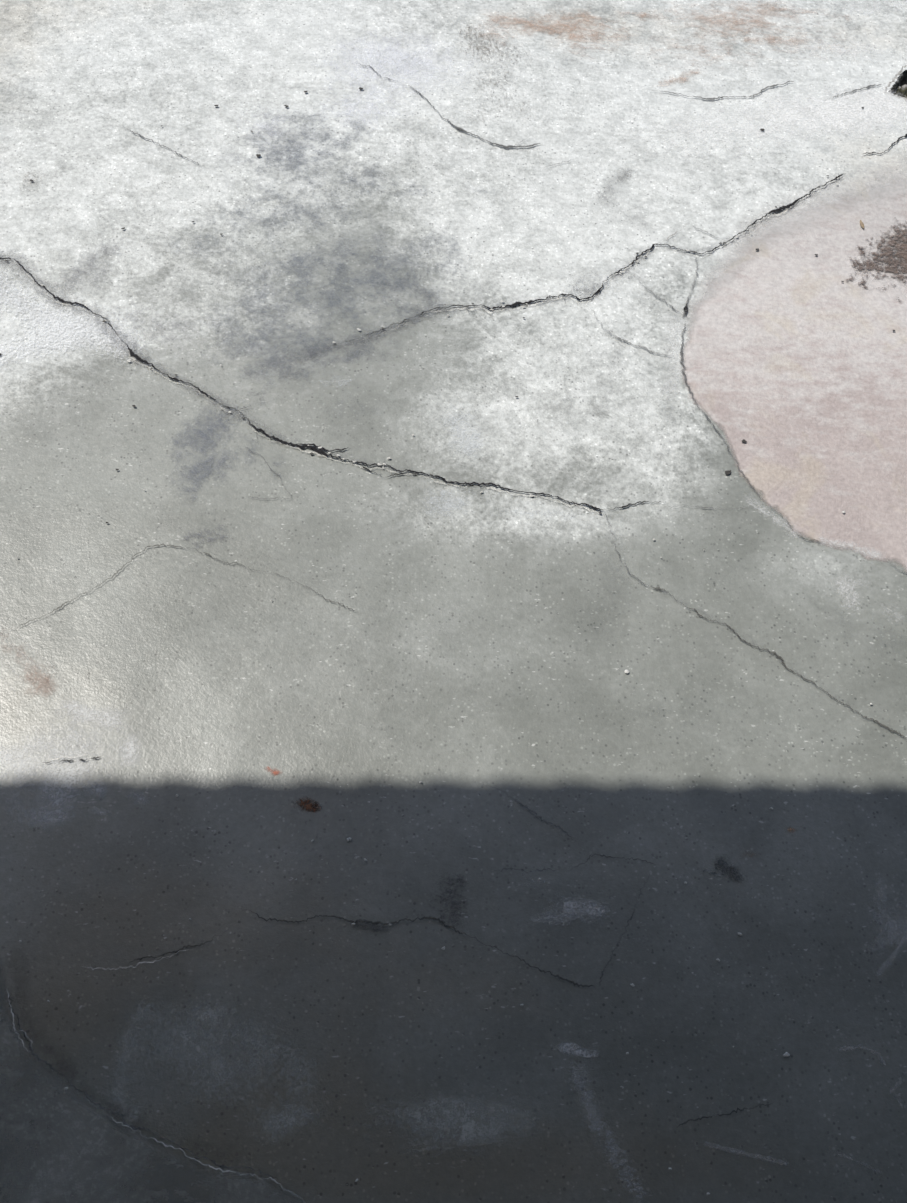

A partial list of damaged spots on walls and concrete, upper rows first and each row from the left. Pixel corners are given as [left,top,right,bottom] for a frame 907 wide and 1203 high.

crack [369,65,540,148]
crack [663,81,794,100]
spalling [885,65,907,101]
crack [333,134,907,492]
crack [0,254,664,514]
crack [22,543,237,625]
crack [619,555,903,736]
crack [253,912,604,987]